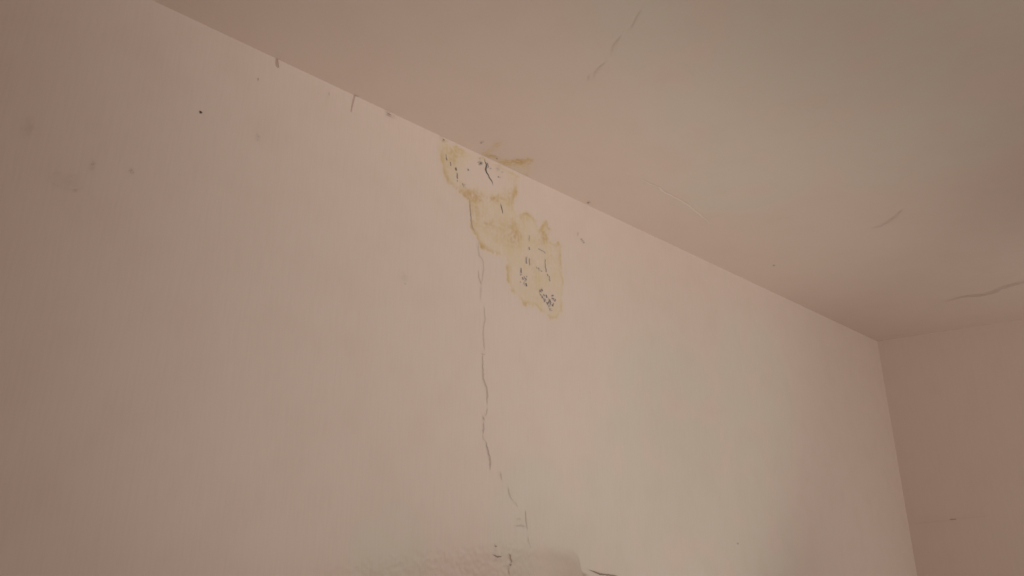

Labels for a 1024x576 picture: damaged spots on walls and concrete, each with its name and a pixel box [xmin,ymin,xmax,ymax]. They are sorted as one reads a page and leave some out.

crack [469,199,531,575]
leakage [435,137,566,324]